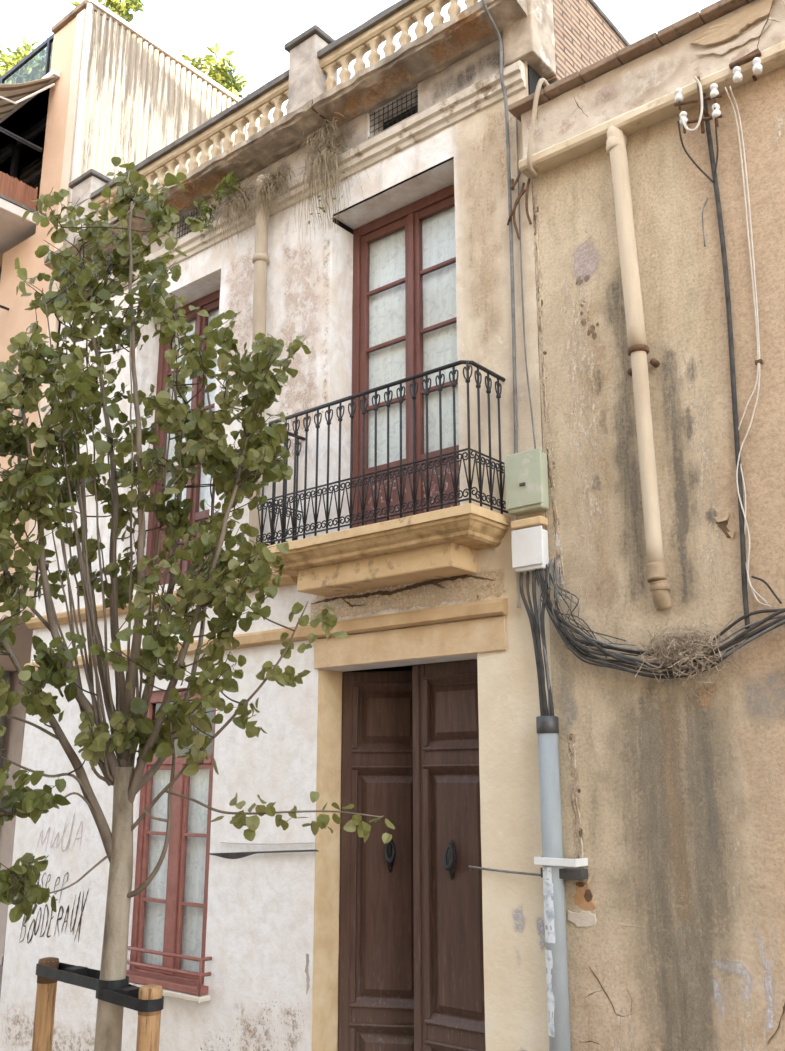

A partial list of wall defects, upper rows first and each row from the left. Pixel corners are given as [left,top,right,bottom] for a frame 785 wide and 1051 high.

flaking render [690,0,785,56]
damp [554,241,644,607]
damp [662,351,719,601]
crack [311,574,494,607]
spalling [567,733,596,910]
damp [613,687,774,1051]
crack [588,964,633,1017]
crack [761,977,785,1045]